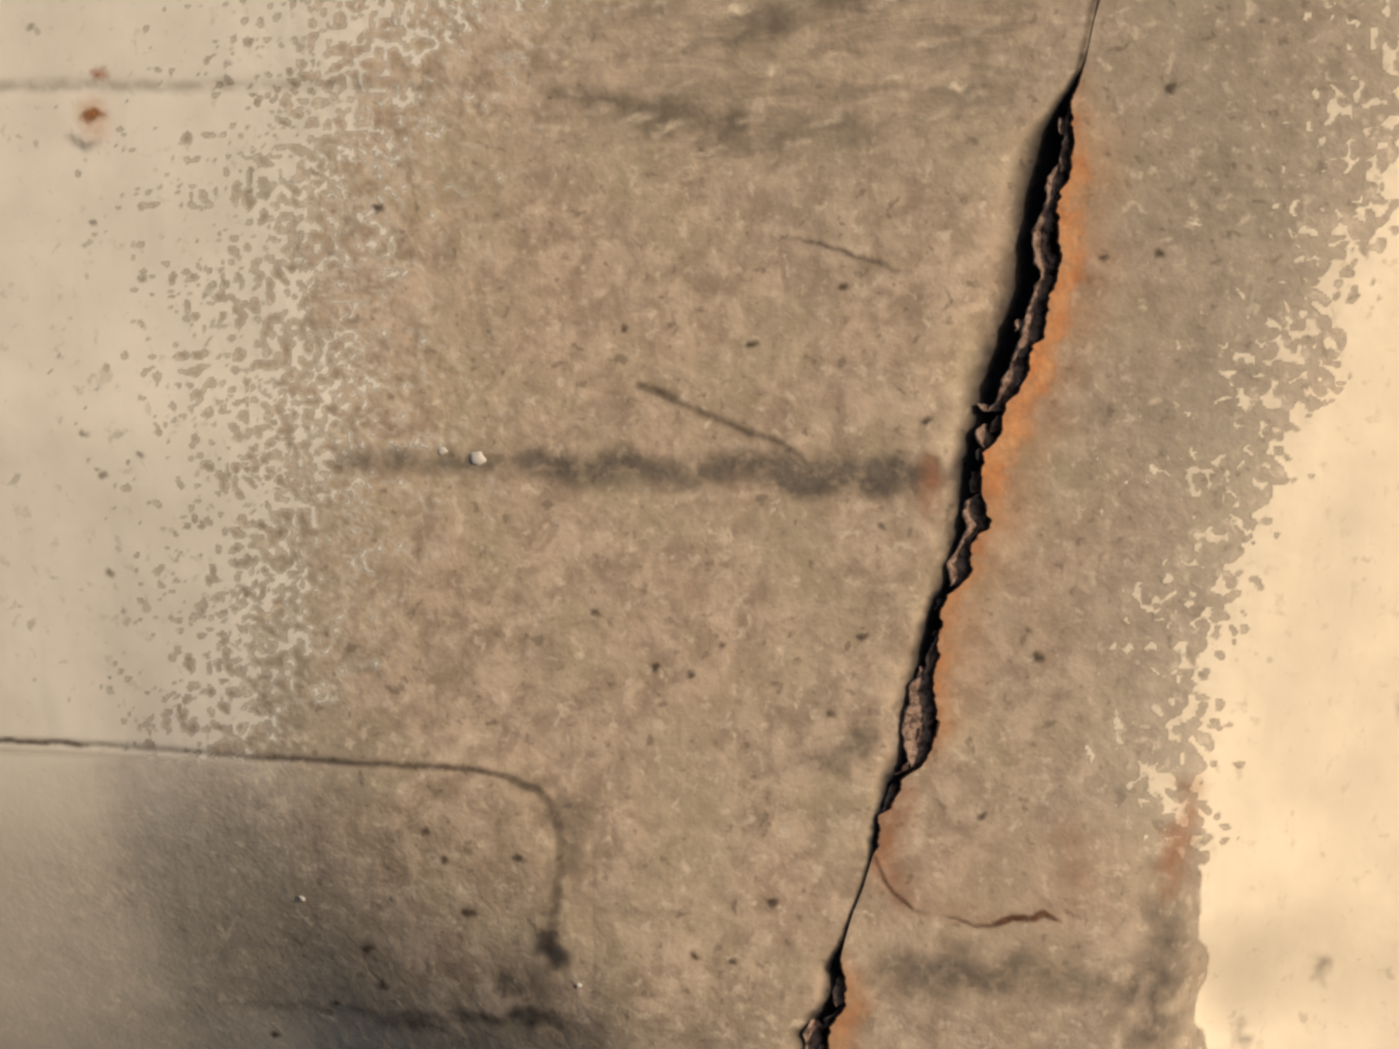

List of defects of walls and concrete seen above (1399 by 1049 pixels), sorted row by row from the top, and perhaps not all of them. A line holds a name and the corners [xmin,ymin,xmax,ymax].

rust [83,109,100,121]
rust [933,115,1089,713]
damp [520,453,680,481]
damp [699,456,939,495]
crack [799,39,1087,1049]